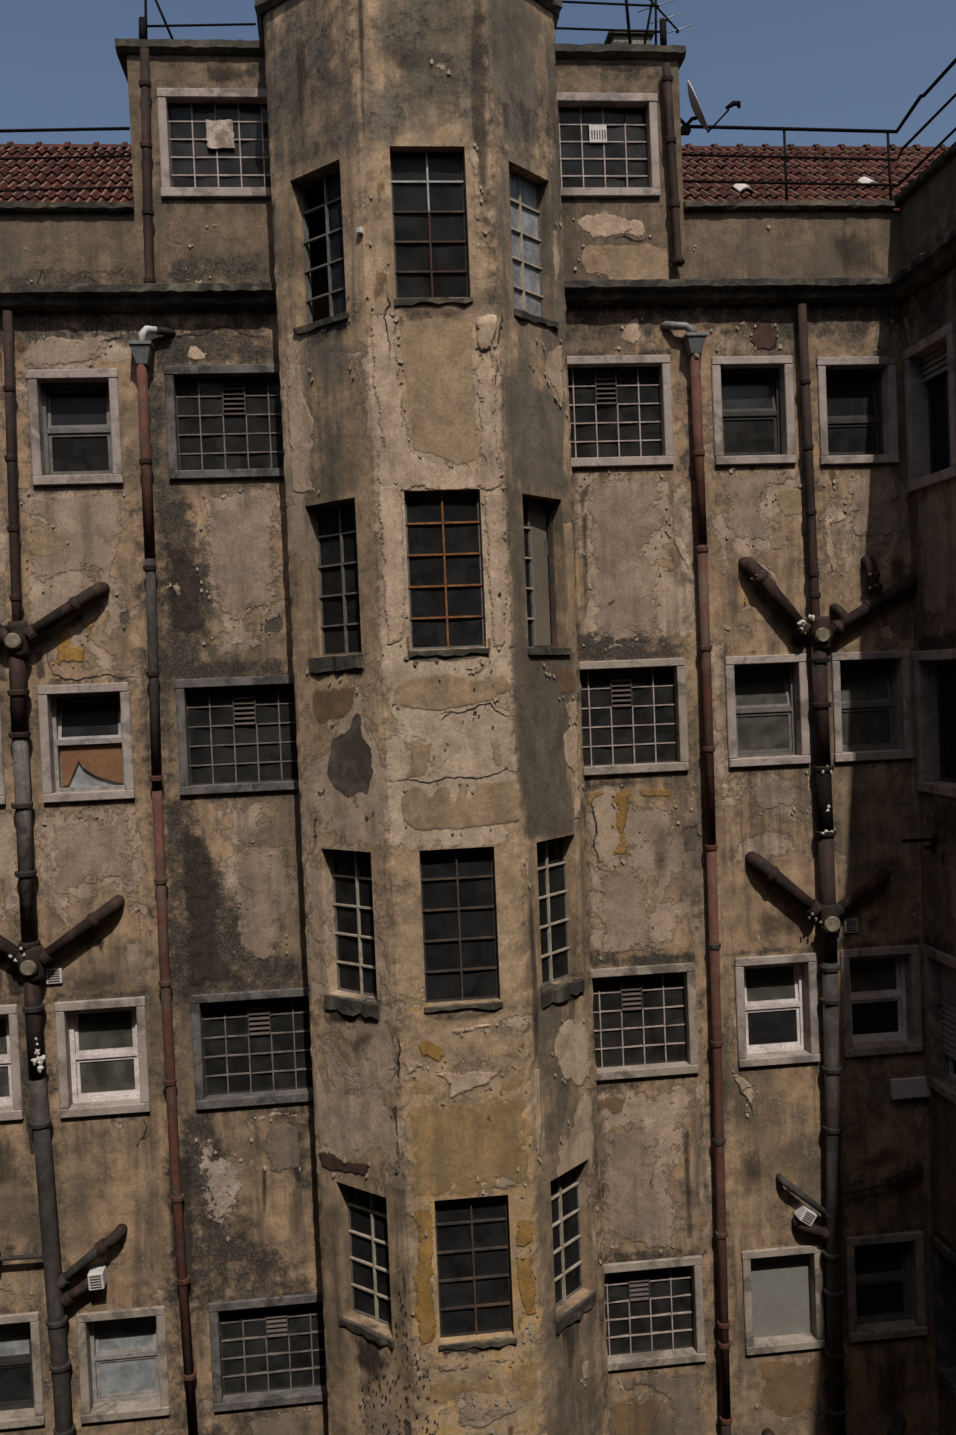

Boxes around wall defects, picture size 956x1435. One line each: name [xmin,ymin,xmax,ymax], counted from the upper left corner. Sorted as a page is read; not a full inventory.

peeling [553,210,672,283]
crack [383,293,391,359]
crack [494,314,504,386]
spalling [736,318,782,351]
leakage [166,542,270,648]
peeling [312,681,373,798]
crack [440,702,513,721]
leakage [183,828,234,986]
peeling [529,1019,676,1264]
peeling [580,1360,589,1388]